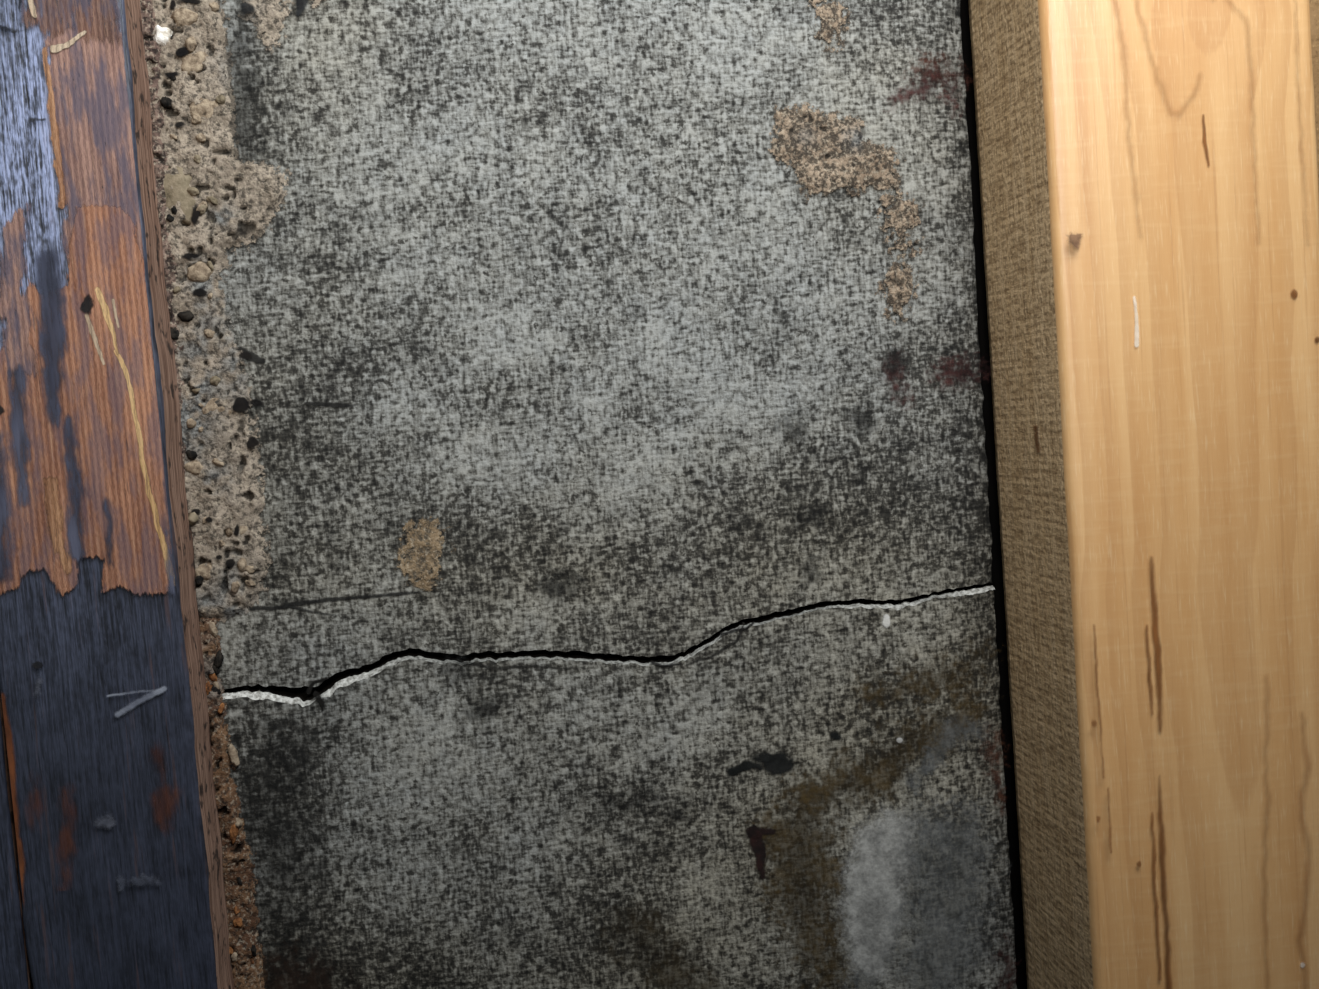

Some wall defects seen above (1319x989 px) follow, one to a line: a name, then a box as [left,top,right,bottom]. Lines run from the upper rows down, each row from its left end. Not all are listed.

peeling [0,0,174,596]
crack [222,582,995,711]
damp [727,752,793,775]
damp [746,698,982,987]